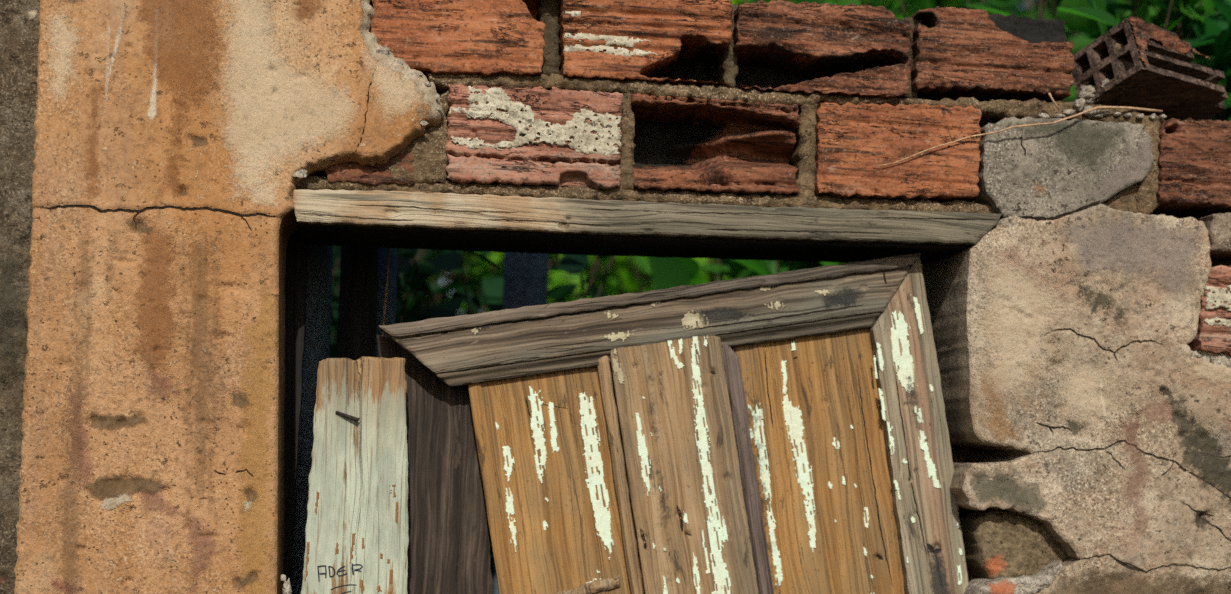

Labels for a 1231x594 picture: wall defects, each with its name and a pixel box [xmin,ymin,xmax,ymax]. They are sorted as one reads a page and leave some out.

flaking render [360,0,444,135]
flaking render [293,163,333,179]
crack [34,205,278,229]
crack [1040,321,1165,359]
spalling [85,475,165,510]
crack [1029,422,1231,573]